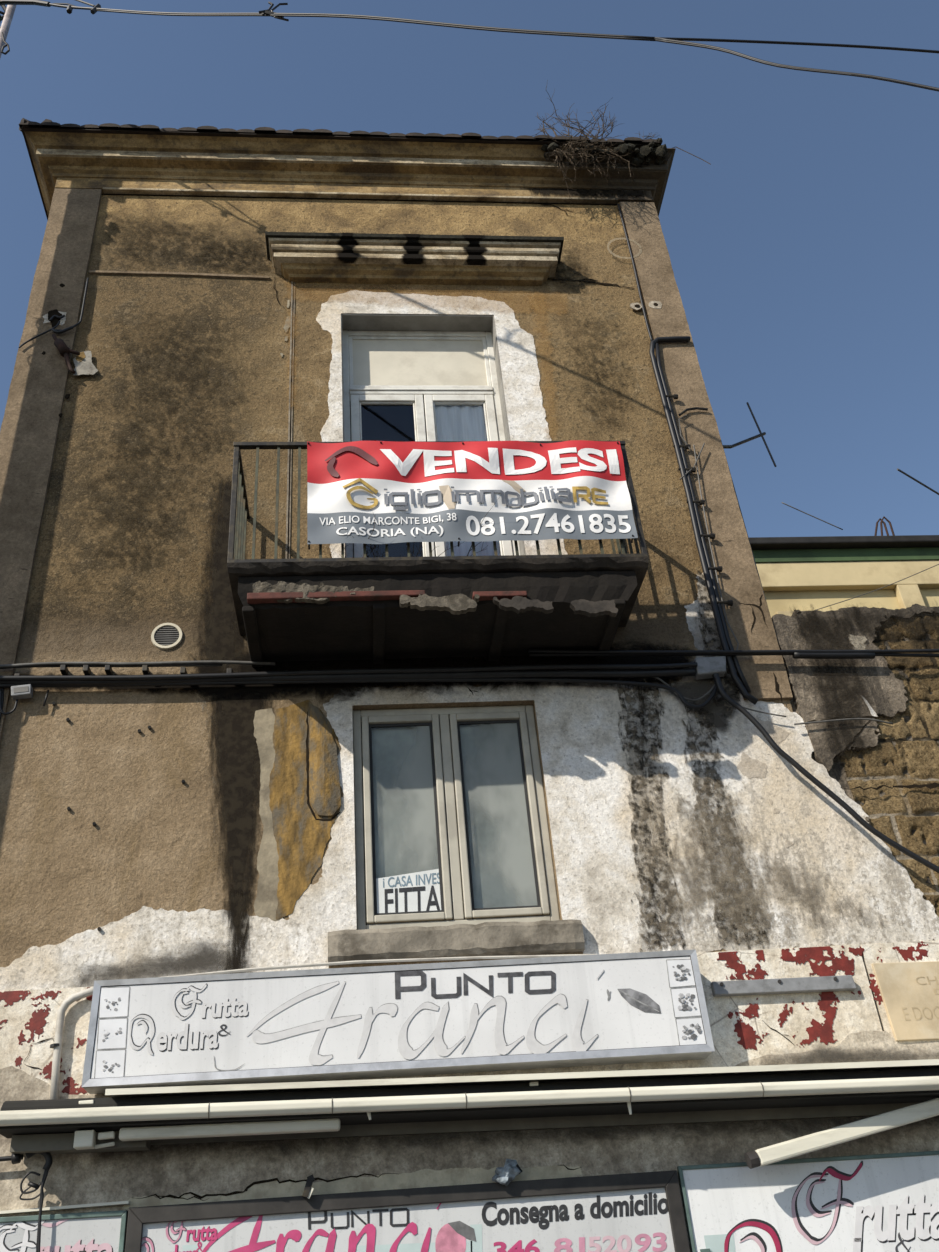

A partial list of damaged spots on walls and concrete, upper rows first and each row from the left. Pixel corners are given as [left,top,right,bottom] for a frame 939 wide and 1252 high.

leakage [116,219,271,270]
flaking render [316,290,551,442]
leakage [96,324,223,565]
flaking render [329,543,345,558]
flaking render [524,539,568,555]
leakage [21,480,883,986]
flaking render [0,573,939,1069]
peeling [39,1038,88,1095]
crack [137,1173,395,1201]